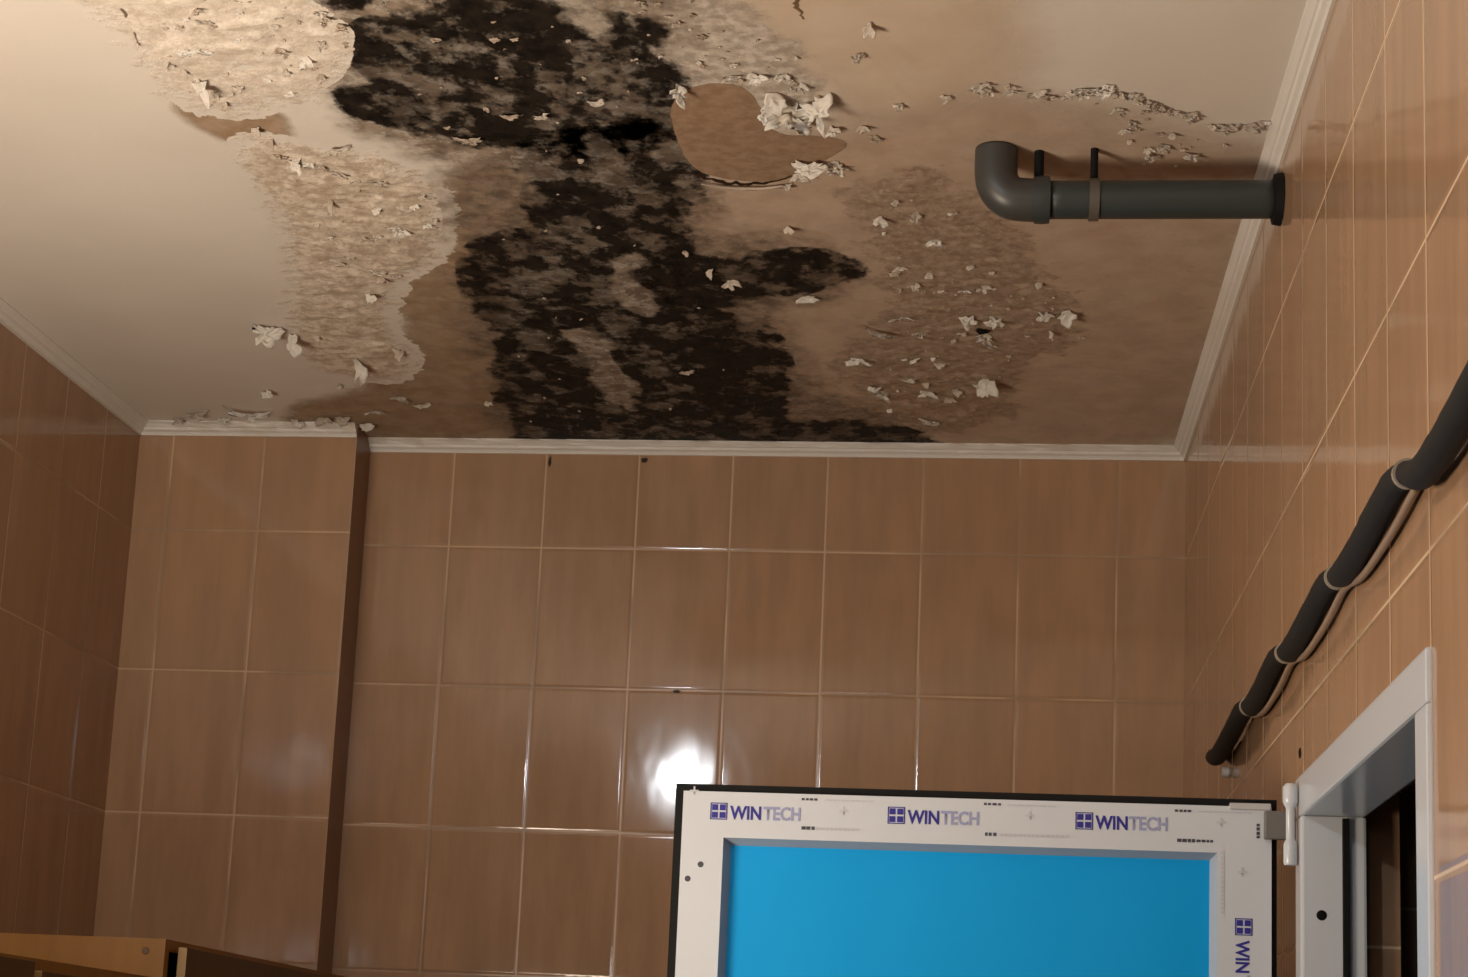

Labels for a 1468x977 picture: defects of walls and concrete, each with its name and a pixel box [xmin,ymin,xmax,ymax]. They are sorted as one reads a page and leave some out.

peeling [443,126,483,146]
peeling [483,107,559,124]
peeling [577,76,630,108]
peeling [939,82,1272,167]
peeling [59,0,461,432]
leakage [288,0,1262,467]
peeling [633,0,1085,433]